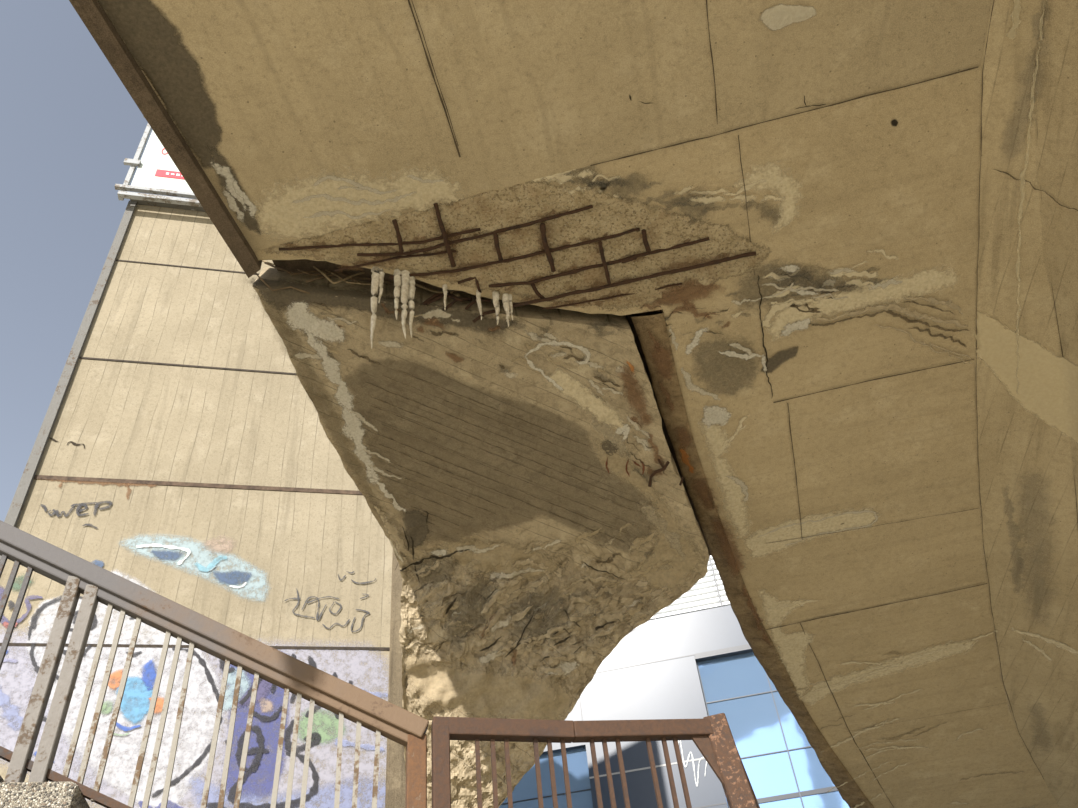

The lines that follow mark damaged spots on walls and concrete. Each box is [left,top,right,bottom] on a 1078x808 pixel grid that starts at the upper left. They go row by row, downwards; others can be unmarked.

peeling [760,4,816,31]
damp [97,0,462,240]
damp [250,278,516,511]
spalling [262,181,770,323]
damp [499,332,661,476]
damp [674,163,801,230]
crack [757,276,773,397]
damp [681,368,879,557]
damp [665,249,957,373]
crack [395,549,470,581]
flaking render [374,420,699,720]